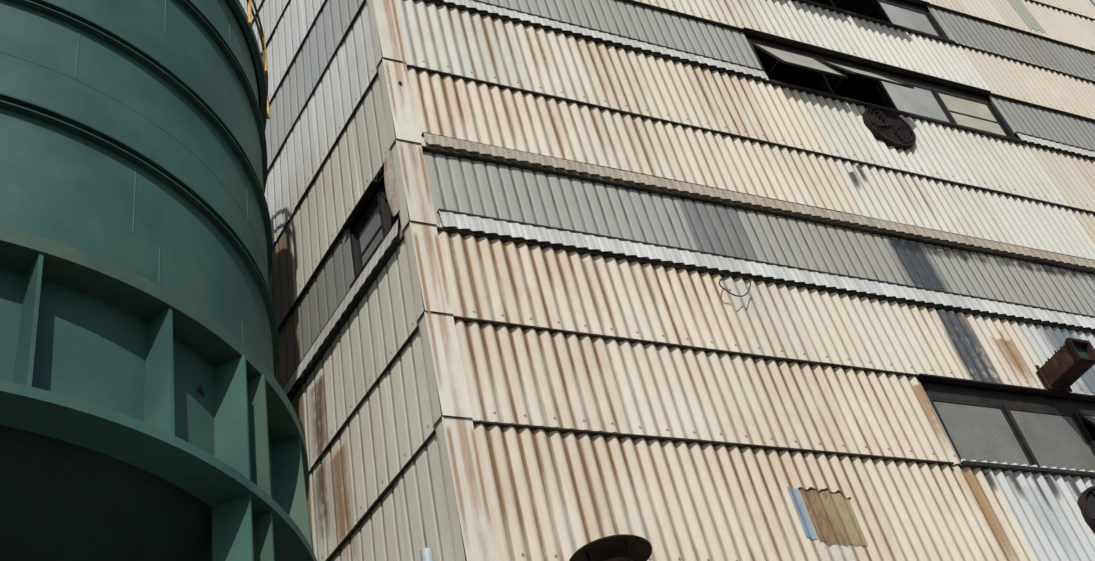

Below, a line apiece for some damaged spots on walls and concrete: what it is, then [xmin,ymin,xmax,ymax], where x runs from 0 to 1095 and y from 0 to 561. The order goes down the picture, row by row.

corrosion [415,233,436,351]
corrosion [435,234,477,310]
corrosion [915,385,942,428]
corrosion [315,377,350,538]
corrosion [447,427,463,507]
corrosion [472,429,501,512]
corrosion [963,471,1007,545]